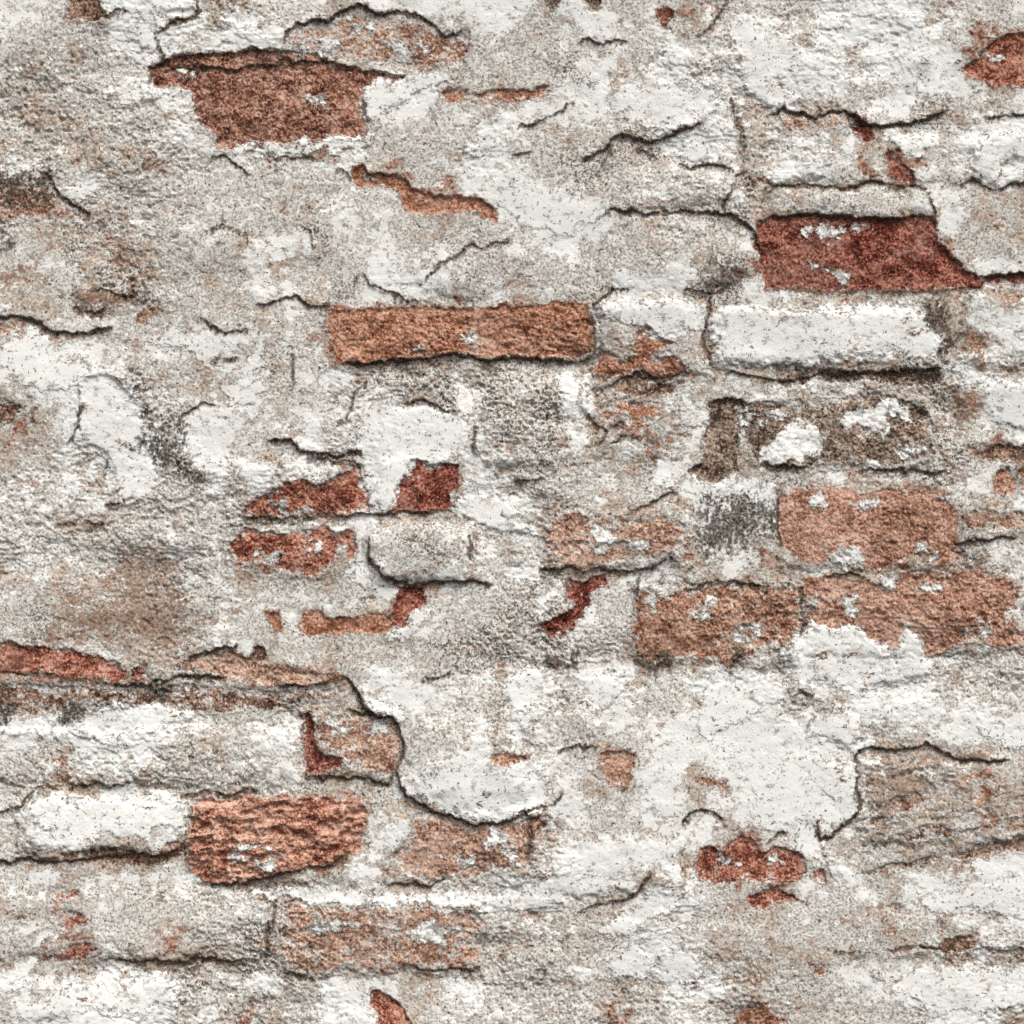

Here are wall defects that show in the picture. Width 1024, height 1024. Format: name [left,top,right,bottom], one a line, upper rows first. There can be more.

spalling [102,0,608,238]
crack [581,97,948,253]
spalling [907,32,1024,97]
crack [0,282,137,336]
crack [421,670,453,683]
spalling [0,209,1024,1024]
crack [274,676,564,858]
crack [813,741,1011,841]